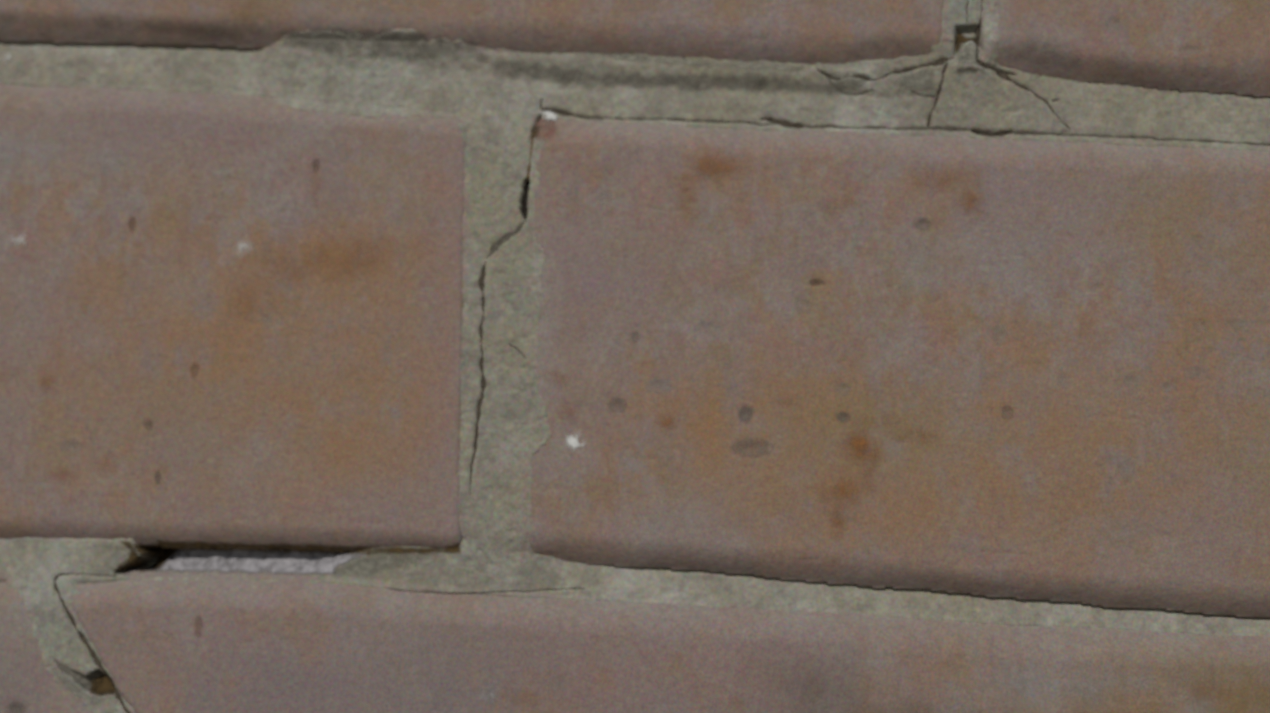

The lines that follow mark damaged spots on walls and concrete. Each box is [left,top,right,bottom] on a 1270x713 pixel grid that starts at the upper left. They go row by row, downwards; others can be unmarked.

crack [469,0,1270,492]
crack [54,573,130,713]